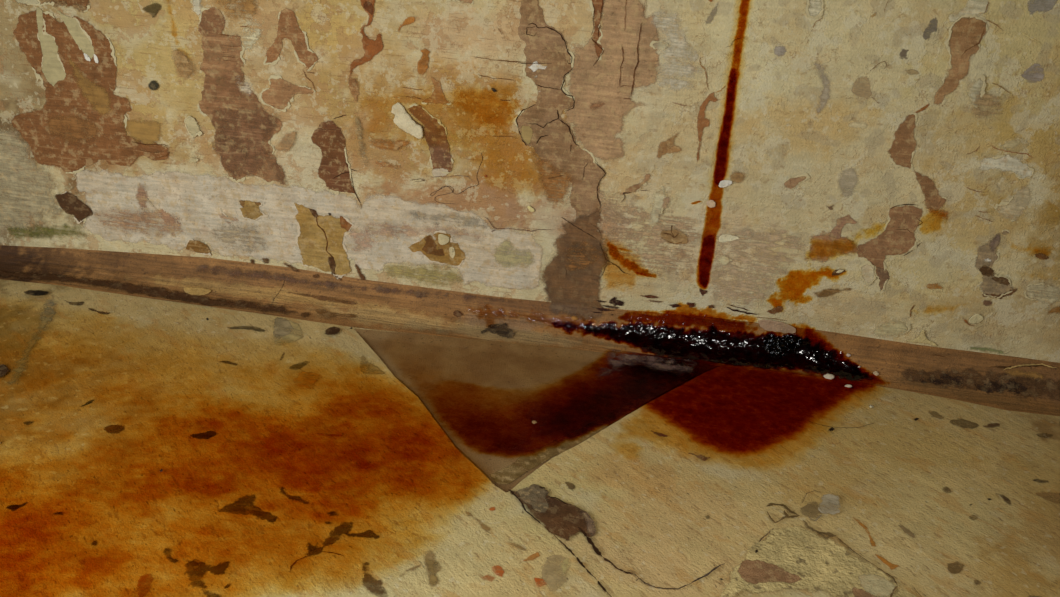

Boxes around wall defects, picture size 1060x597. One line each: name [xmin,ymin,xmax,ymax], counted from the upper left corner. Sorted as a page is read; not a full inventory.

peeling [11,0,169,174]
peeling [198,7,318,184]
peeling [311,115,362,208]
peeling [513,0,604,216]
crack [507,0,645,210]
rust [691,0,749,296]
peeling [809,0,988,291]
rust [481,323,517,338]
rust [593,297,624,315]
rust [767,269,845,314]
rust [0,352,873,597]
crack [509,490,725,597]